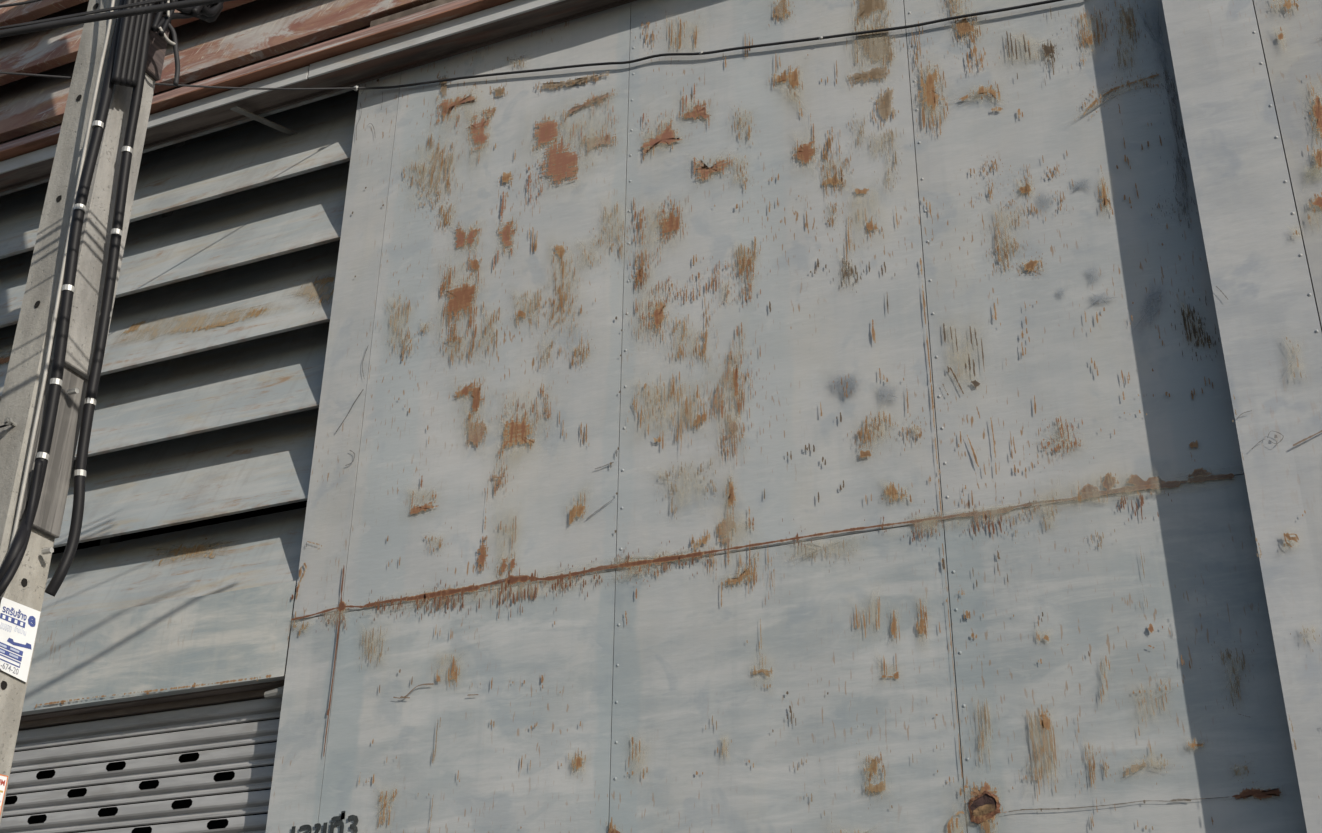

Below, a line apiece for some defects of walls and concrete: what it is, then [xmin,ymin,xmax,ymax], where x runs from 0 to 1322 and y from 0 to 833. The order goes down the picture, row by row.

rust [491,55,527,97]
rust [535,71,609,94]
rust [403,134,463,230]
rust [498,150,516,187]
rust [288,196,1234,833]